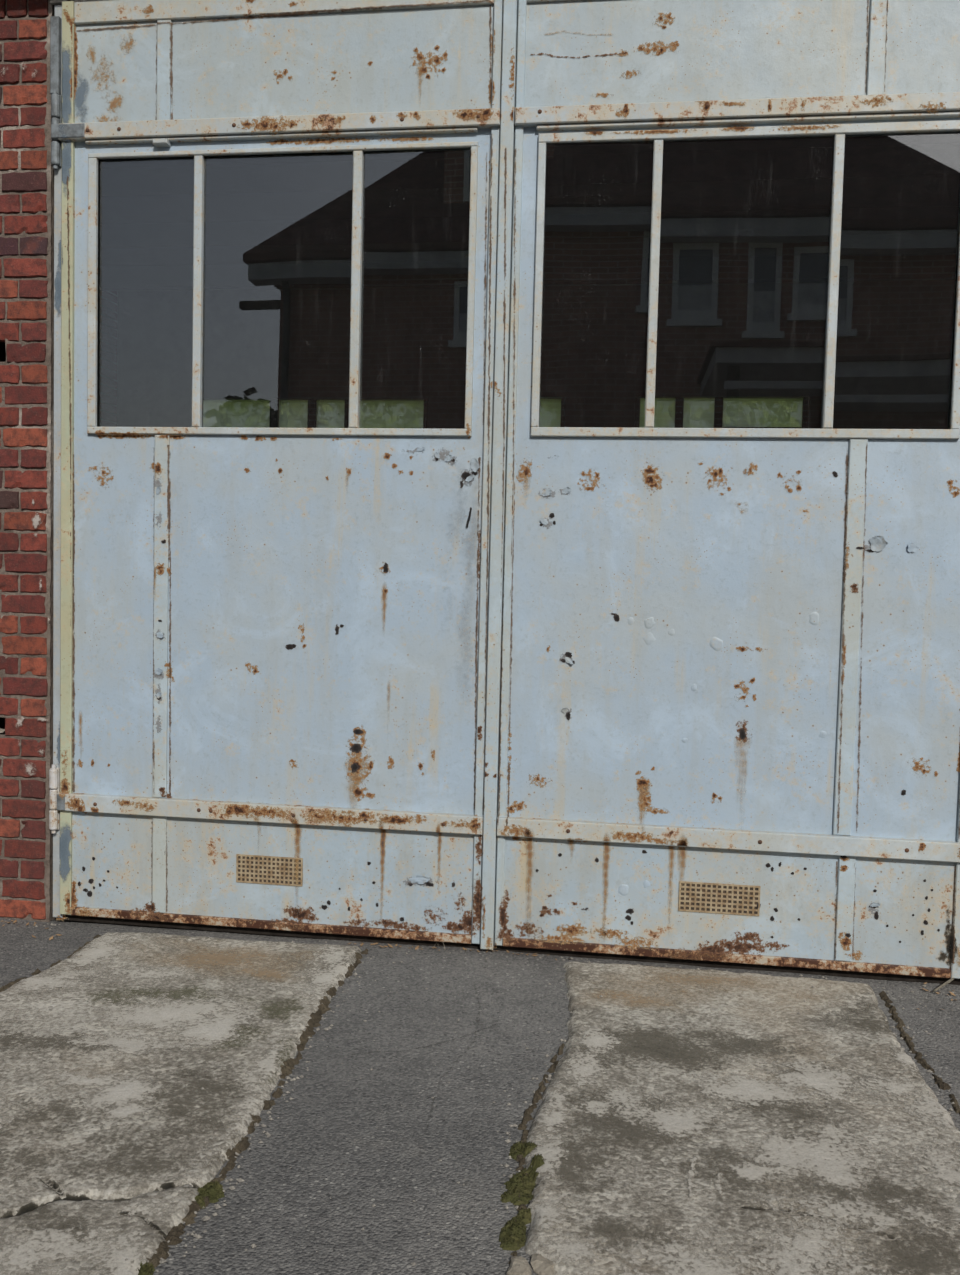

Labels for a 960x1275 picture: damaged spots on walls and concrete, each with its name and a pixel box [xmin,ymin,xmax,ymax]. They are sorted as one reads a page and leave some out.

corrosion [411,45,448,84]
corrosion [453,30,518,125]
corrosion [531,12,679,79]
corrosion [236,115,433,145]
corrosion [642,462,662,493]
corrosion [698,462,758,495]
corrosion [224,726,653,950]
corrosion [595,767,687,912]
corrosion [56,881,92,921]
corrosion [594,932,789,1006]
corrosion [838,932,863,960]
crack [0,1179,199,1239]